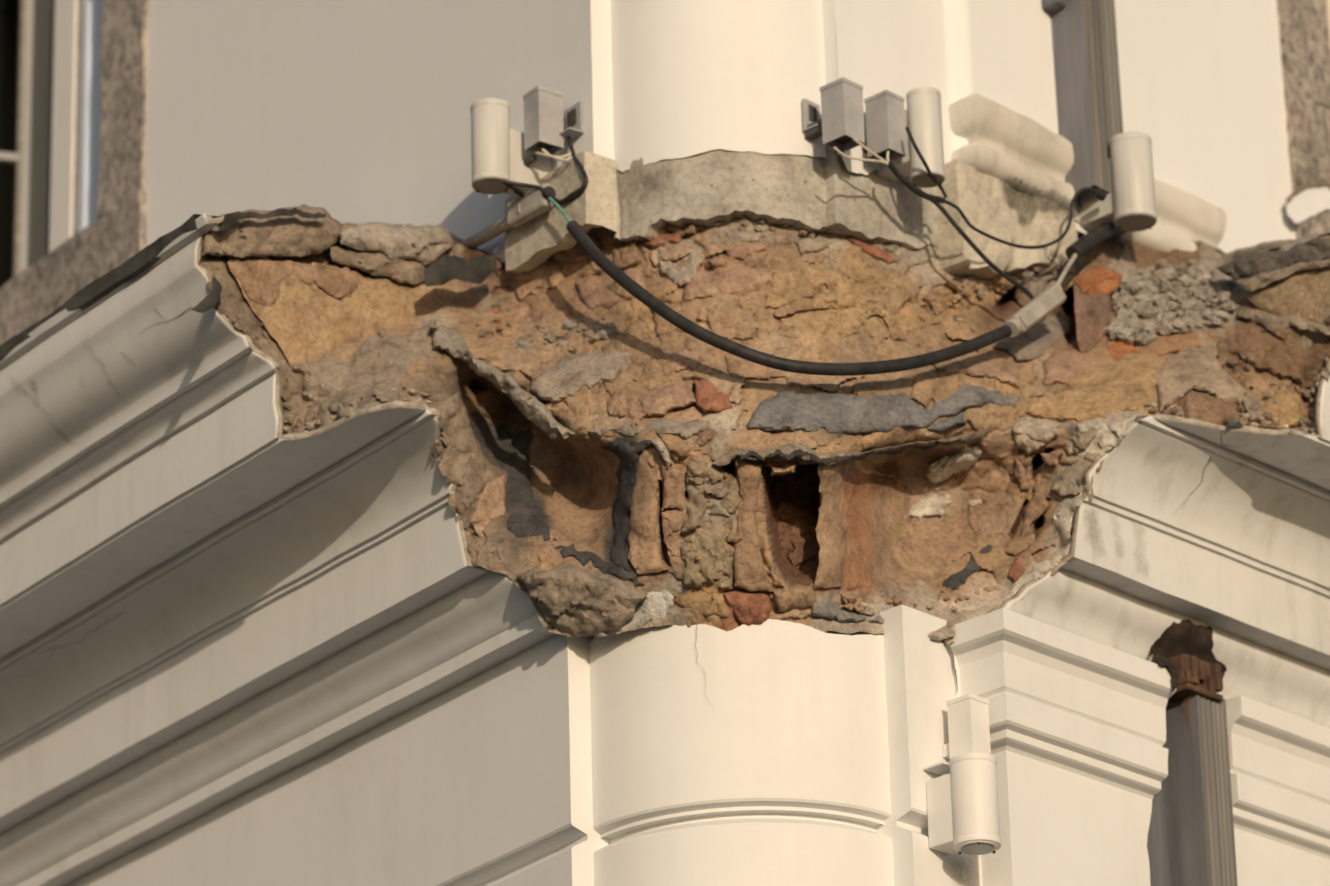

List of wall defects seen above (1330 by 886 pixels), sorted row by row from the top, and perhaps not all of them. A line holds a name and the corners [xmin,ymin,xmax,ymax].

spalling [191,146,1330,645]